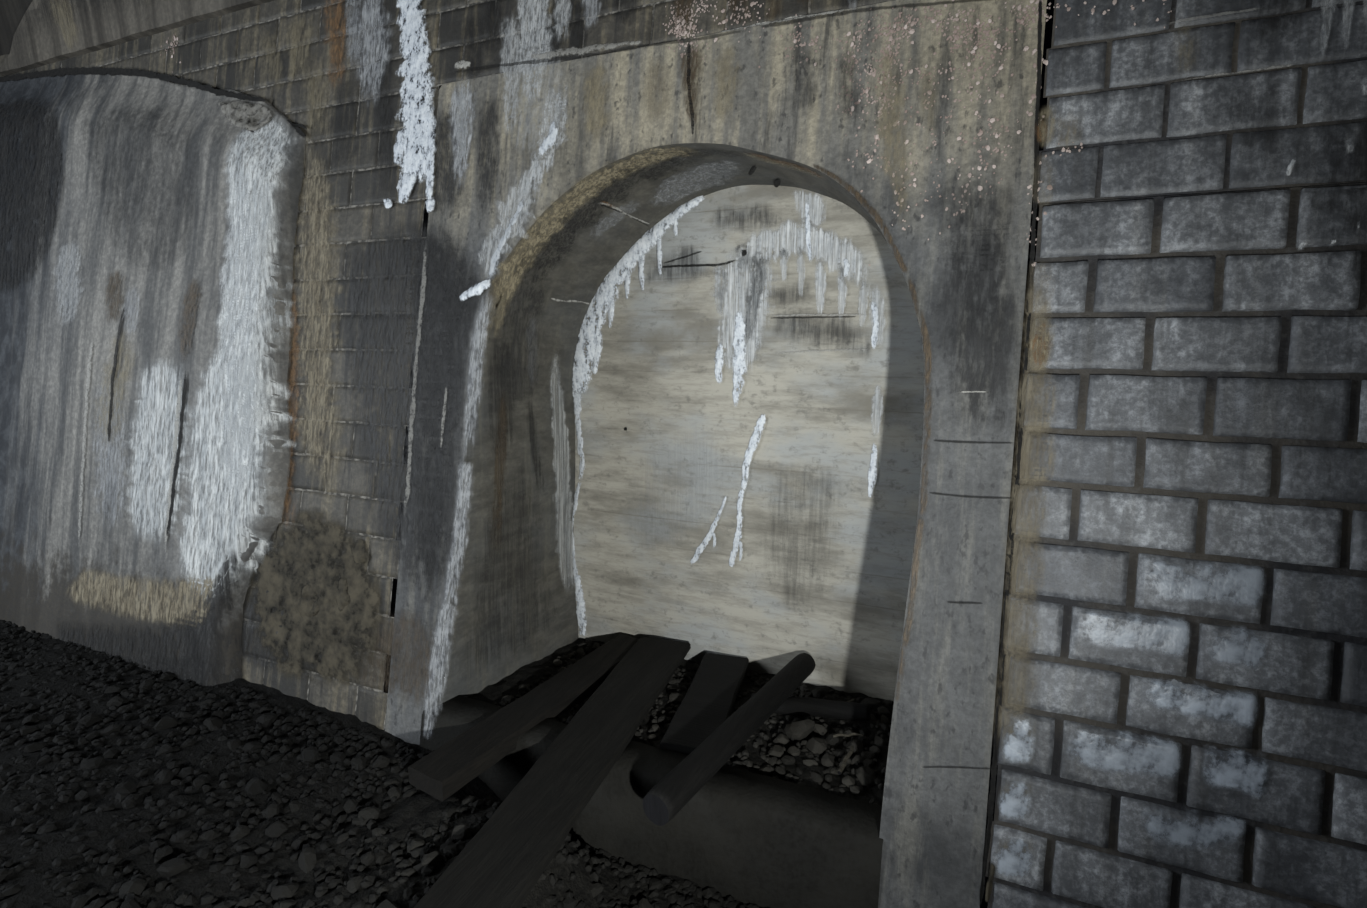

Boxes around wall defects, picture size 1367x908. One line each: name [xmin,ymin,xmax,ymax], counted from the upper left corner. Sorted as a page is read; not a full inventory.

crack [455,60,471,68]
crack [681,9,843,134]
leakage [0,100,63,290]
leakage [58,120,341,686]
leakage [346,0,735,636]
leakage [690,414,766,567]
leakage [715,192,885,404]
leakage [868,387,883,497]
leakage [944,199,1015,418]
leakage [364,463,471,737]